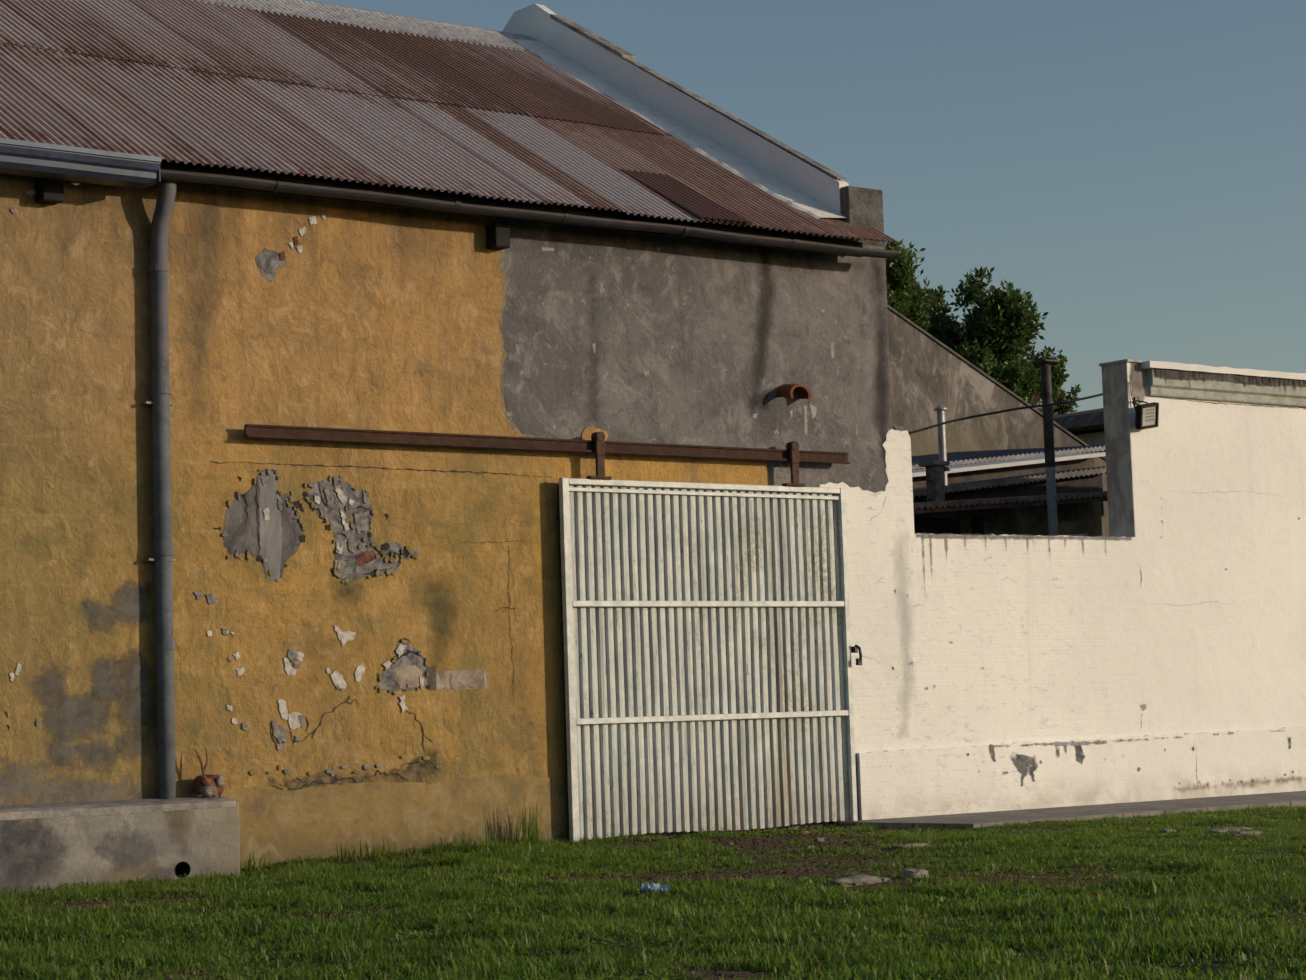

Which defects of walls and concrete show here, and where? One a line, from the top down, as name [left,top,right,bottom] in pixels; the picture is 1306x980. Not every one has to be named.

flaking render [255,215,326,282]
flaking render [213,469,421,584]
damp [84,585,148,628]
peeling [207,628,245,676]
peeling [283,649,304,676]
peeling [334,625,356,646]
flaking render [326,638,430,713]
damp [35,652,155,765]
peeling [226,704,249,731]
crack [303,696,360,741]
flaking render [249,699,442,791]
crack [408,711,434,755]